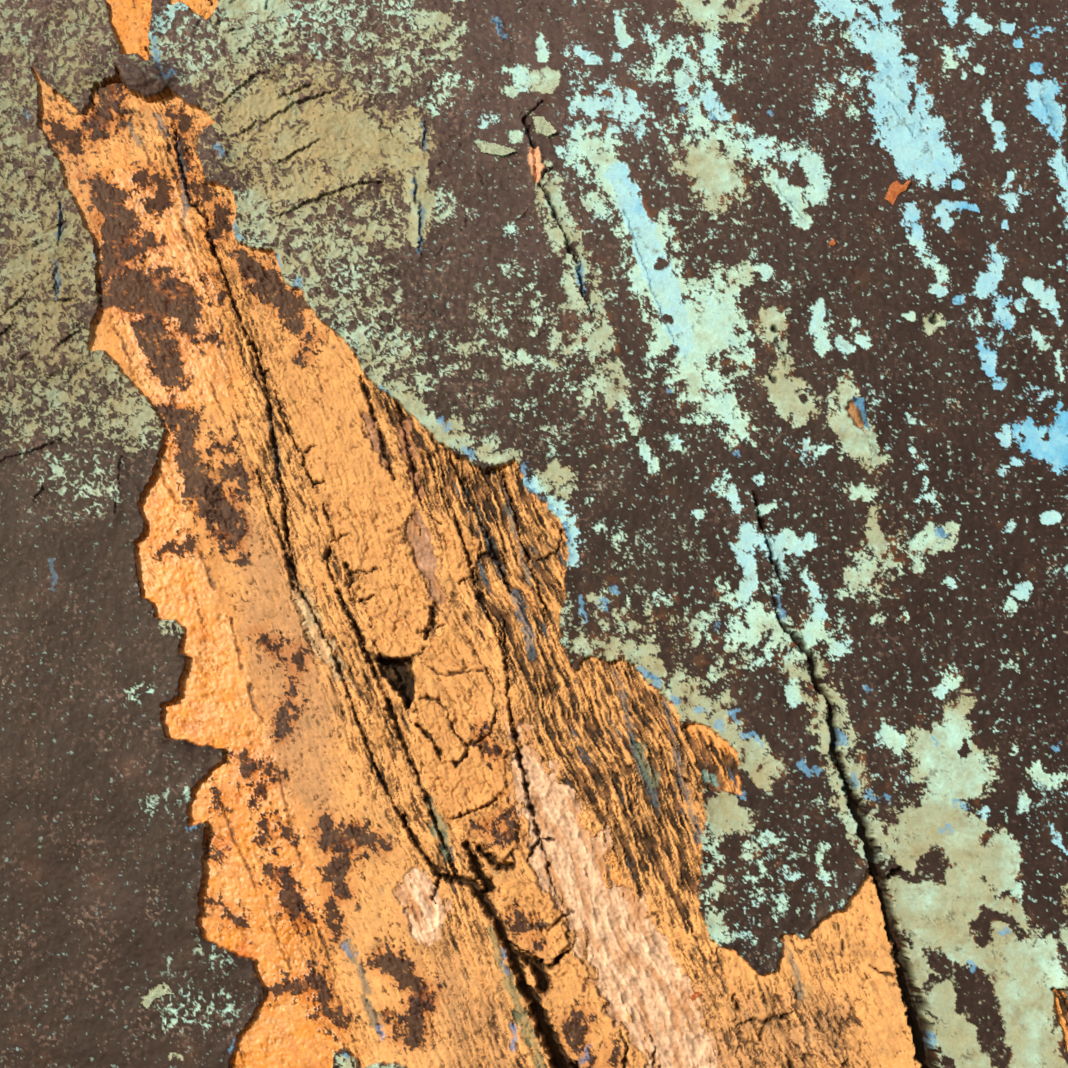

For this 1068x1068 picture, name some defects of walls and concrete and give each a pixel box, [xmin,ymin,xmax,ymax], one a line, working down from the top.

peeling [105,0,152,61]
peeling [148,0,470,102]
peeling [362,336,527,473]
crack [523,100,593,315]
peeling [475,0,961,626]
peeling [812,0,1068,478]
crack [171,121,582,1068]
peeling [517,719,718,1068]
peeling [565,522,869,867]
peeling [698,789,777,949]
crack [753,492,1068,1068]
peeling [775,569,1068,1068]